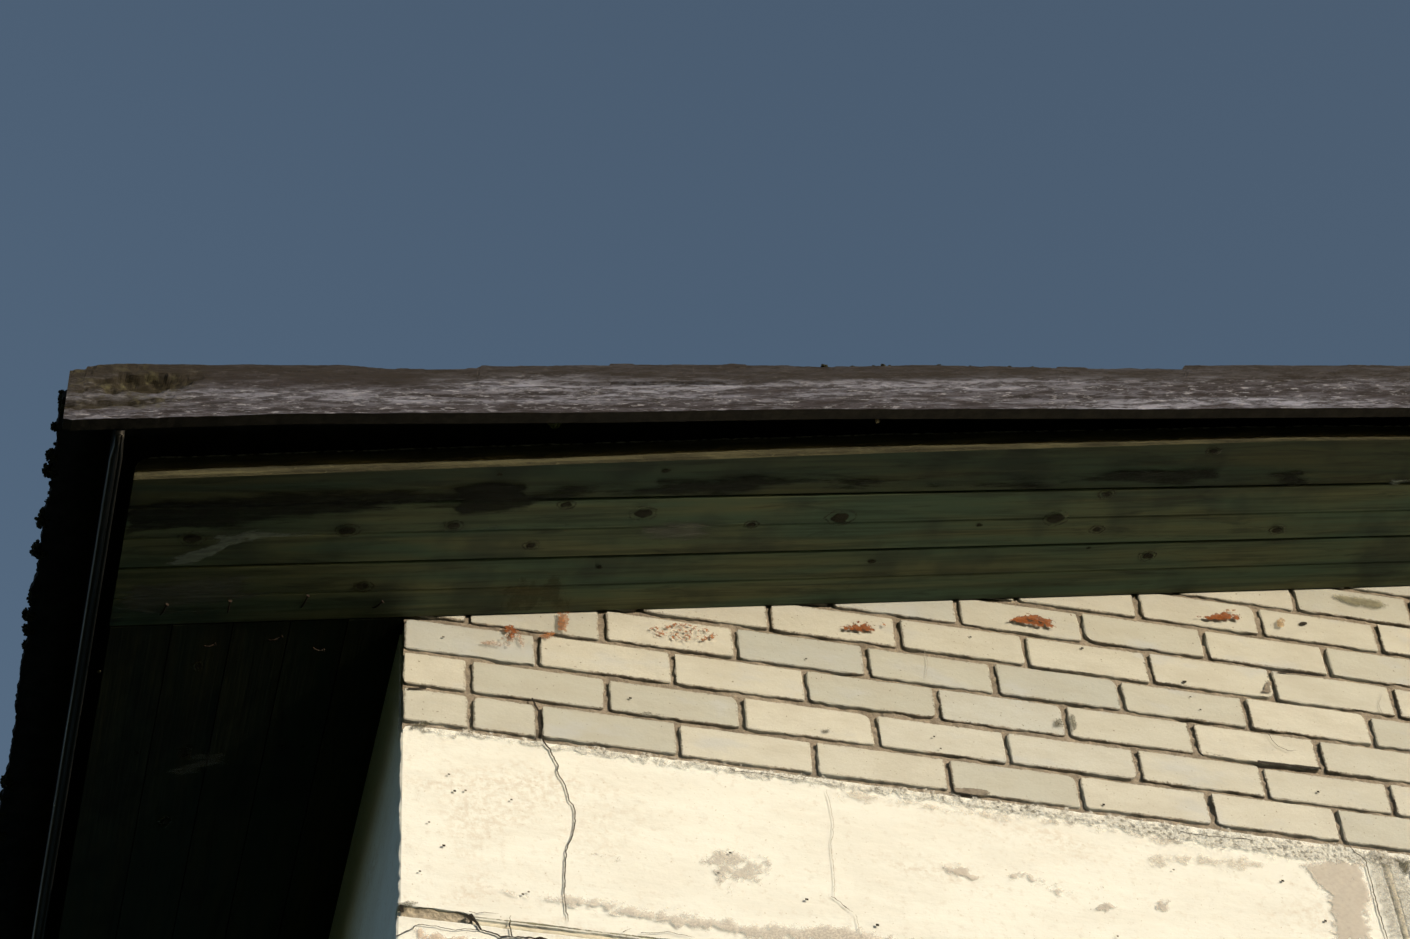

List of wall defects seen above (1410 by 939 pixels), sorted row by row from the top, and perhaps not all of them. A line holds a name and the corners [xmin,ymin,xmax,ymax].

rust [650,622,718,641]
rust [840,621,886,632]
rust [1009,613,1056,628]
rust [1197,609,1242,620]
crack [396,698,576,939]
spalling [521,737,1410,939]
spalling [399,901,475,939]